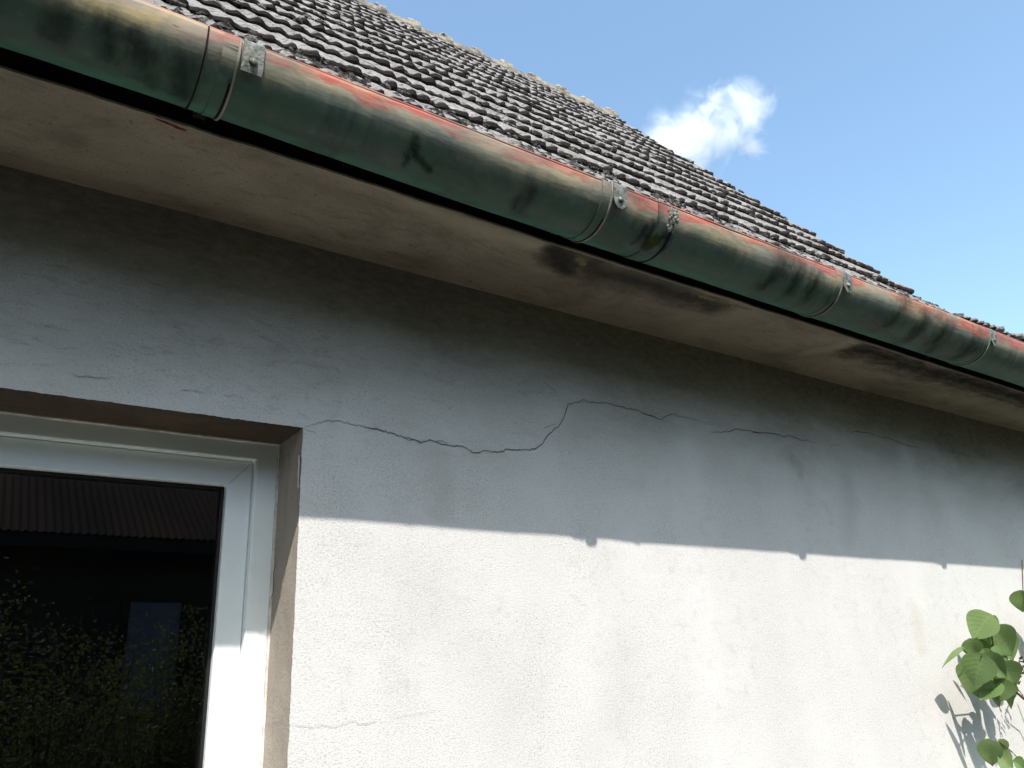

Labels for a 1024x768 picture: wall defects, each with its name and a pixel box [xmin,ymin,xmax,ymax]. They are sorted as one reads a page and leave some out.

leakage [380,192,724,312]
leakage [788,336,1024,407]
crack [301,387,985,460]